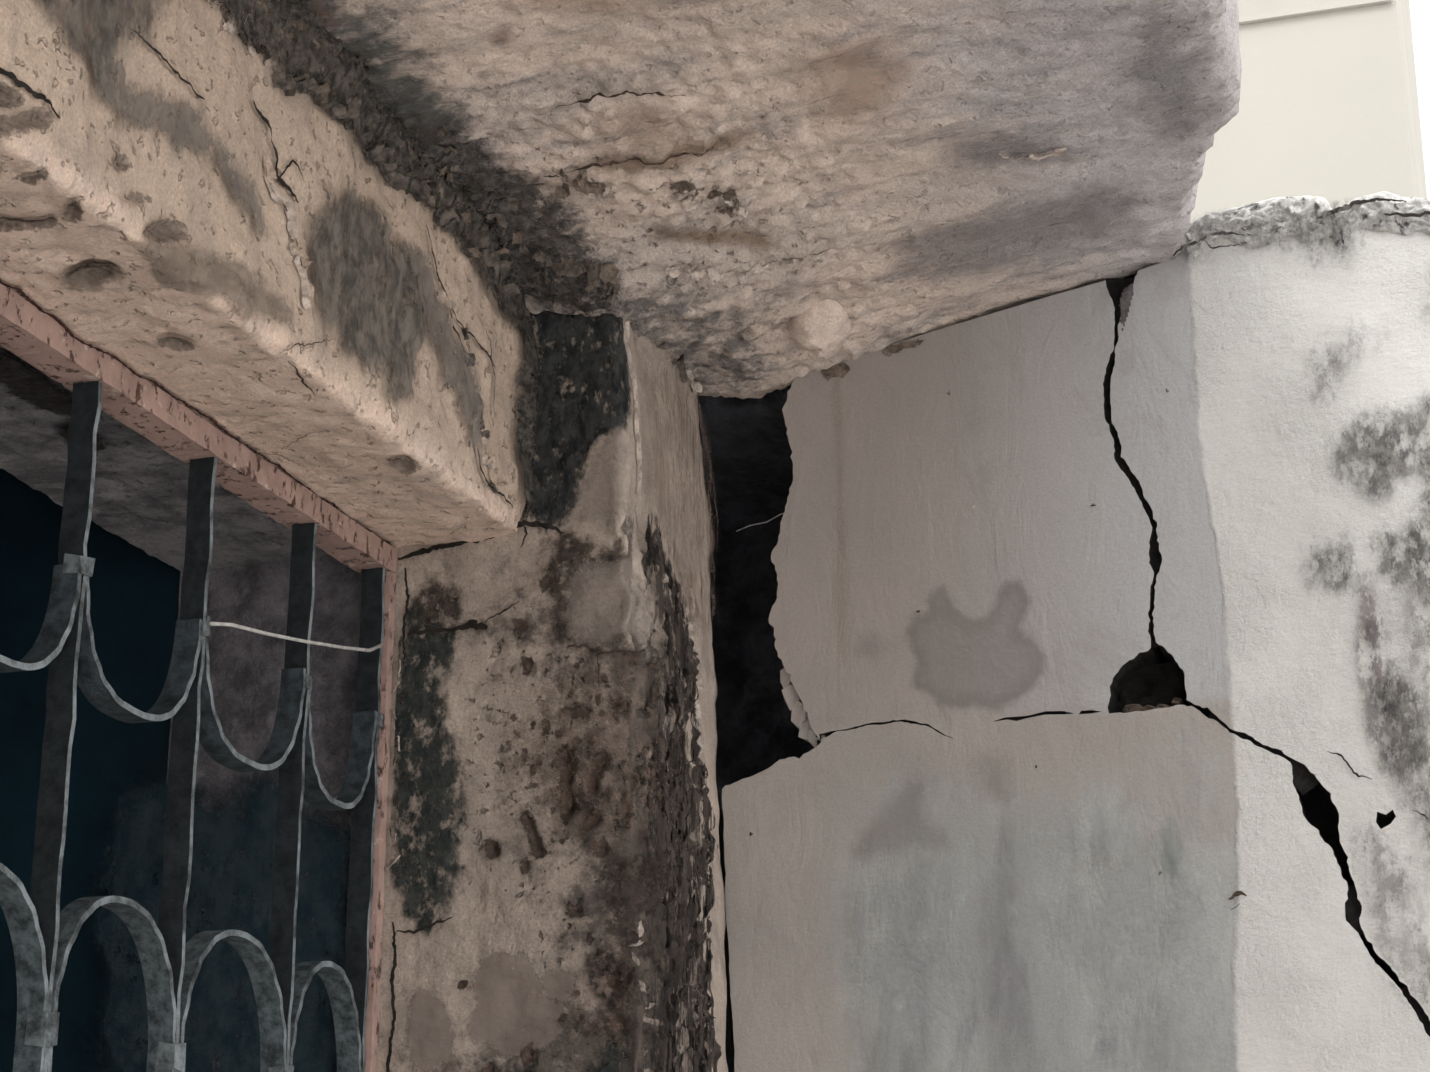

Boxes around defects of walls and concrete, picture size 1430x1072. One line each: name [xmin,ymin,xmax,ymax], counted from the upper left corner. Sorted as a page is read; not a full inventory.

crack [0,67,60,119]
damp [145,233,294,323]
damp [302,0,631,639]
crack [1104,274,1162,648]
damp [1336,397,1430,495]
damp [390,578,465,936]
crack [1005,712,1097,721]
crack [1208,712,1371,795]
damp [1314,521,1430,839]
crack [1345,885,1365,935]
peeling [675,926,712,1072]
crack [1401,986,1430,1037]